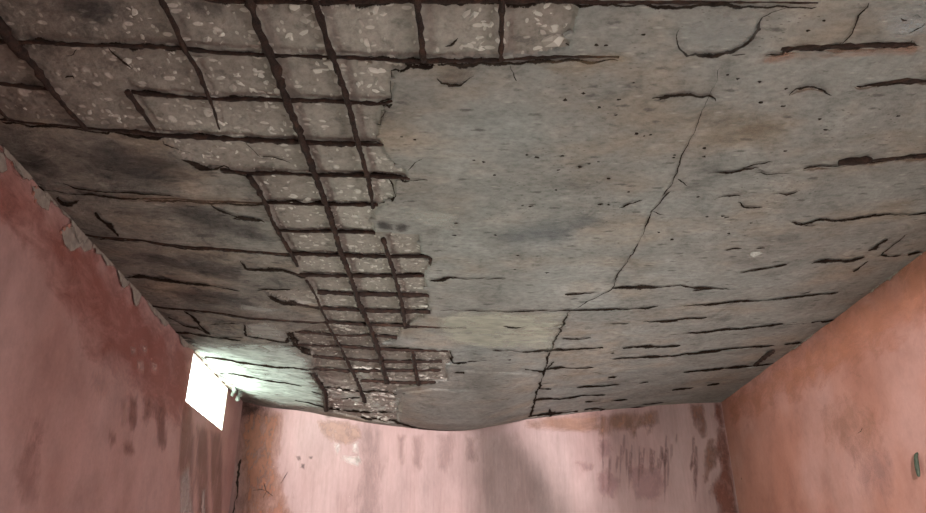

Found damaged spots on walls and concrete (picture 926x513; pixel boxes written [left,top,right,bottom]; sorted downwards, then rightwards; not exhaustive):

spalling [0,0,818,423]
crack [431,3,926,418]
leakage [52,240,228,513]
leakage [546,413,654,434]
leakage [691,404,737,513]